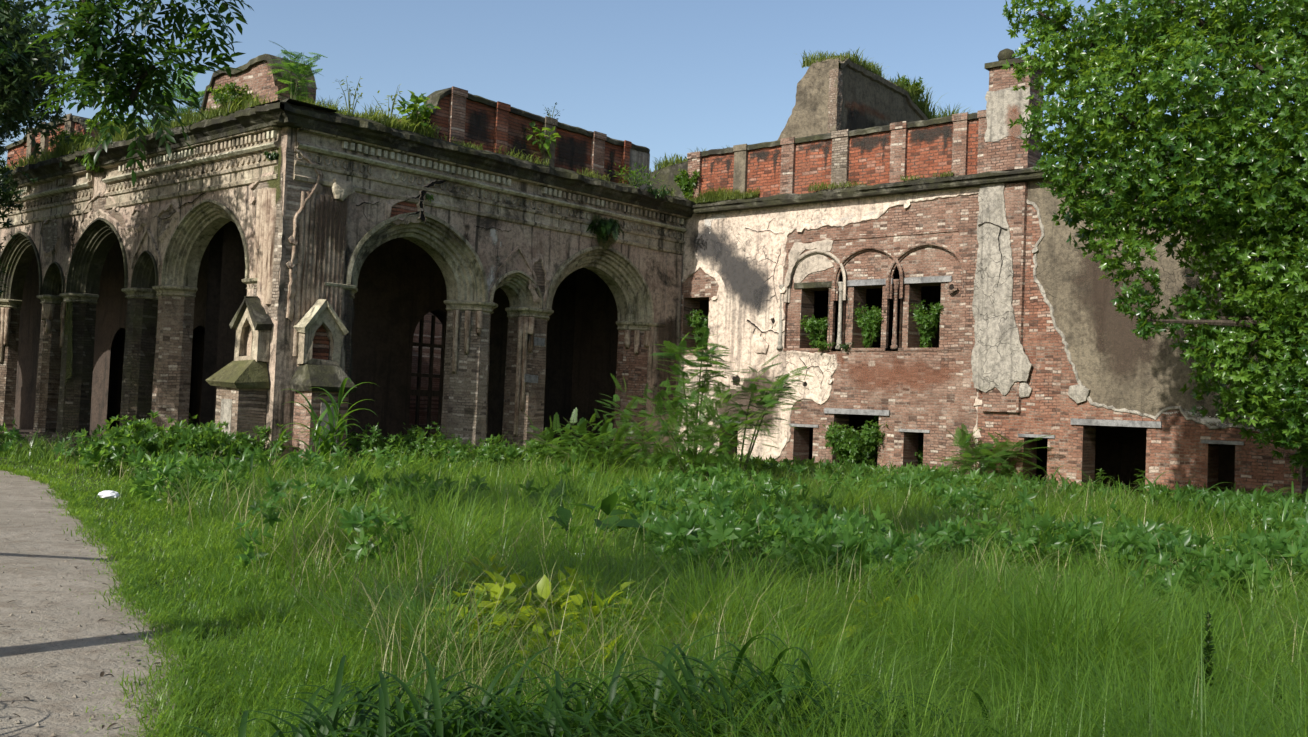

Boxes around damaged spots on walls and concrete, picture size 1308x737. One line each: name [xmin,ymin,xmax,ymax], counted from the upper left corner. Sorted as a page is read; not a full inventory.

leakage [307,199,354,380]
leakage [690,214,770,310]
peeling [737,186,1301,495]